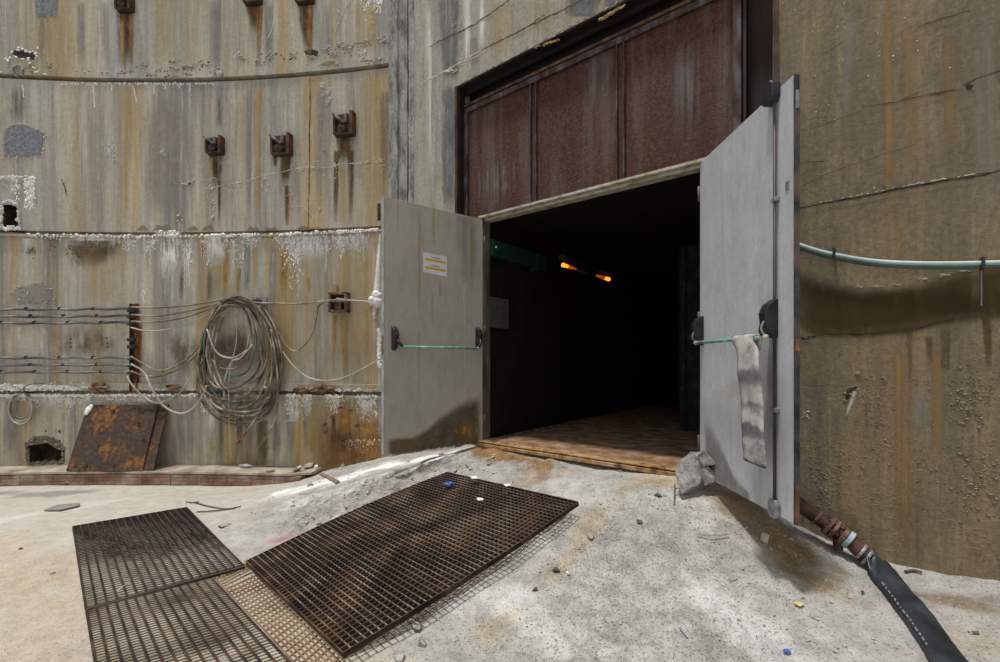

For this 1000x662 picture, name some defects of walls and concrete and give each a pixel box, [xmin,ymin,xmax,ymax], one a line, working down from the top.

rust [119,13,133,56]
rust [300,5,312,50]
spalling [0,46,57,80]
crack [800,70,1000,131]
rust [334,137,353,206]
crack [800,144,1000,209]
spalling [0,199,28,233]
water stain [3,227,381,369]
water stain [801,269,1000,355]
spalling [24,435,66,465]
water stain [280,388,381,422]
water stain [343,403,478,455]